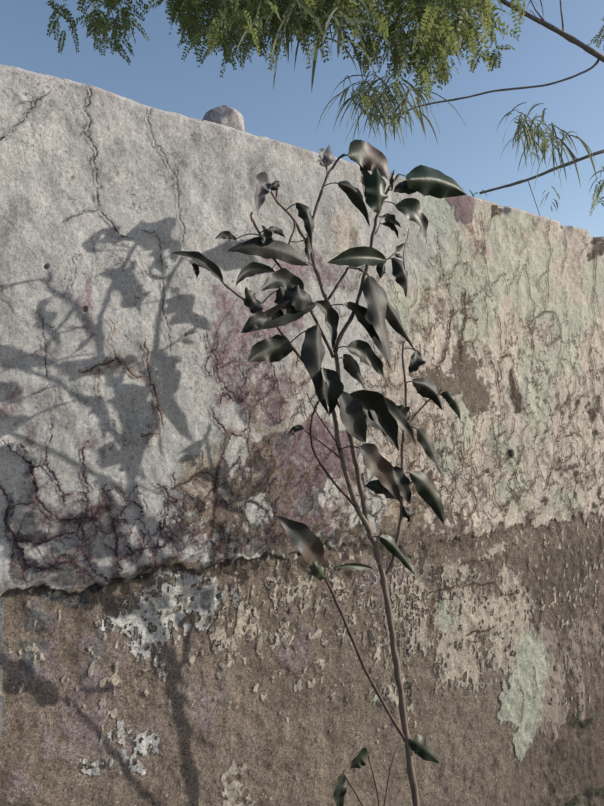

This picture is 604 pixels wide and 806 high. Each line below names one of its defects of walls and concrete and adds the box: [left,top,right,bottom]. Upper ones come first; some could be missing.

crack [0,91,51,140]
crack [63,88,172,347]
crack [147,109,186,241]
crack [0,213,604,592]
peeling [95,432,604,763]
crack [429,559,529,630]
peeling [79,719,160,777]
peeling [221,758,256,806]